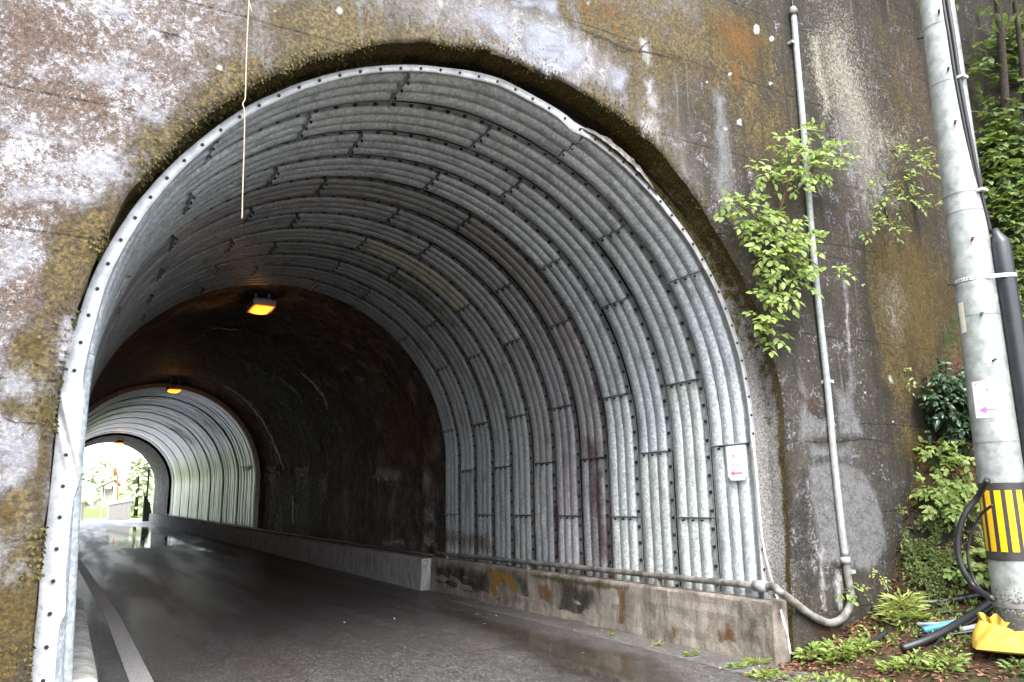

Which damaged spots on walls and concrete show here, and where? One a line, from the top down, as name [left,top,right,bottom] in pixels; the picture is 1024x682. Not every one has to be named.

water stain [796,279,886,609]